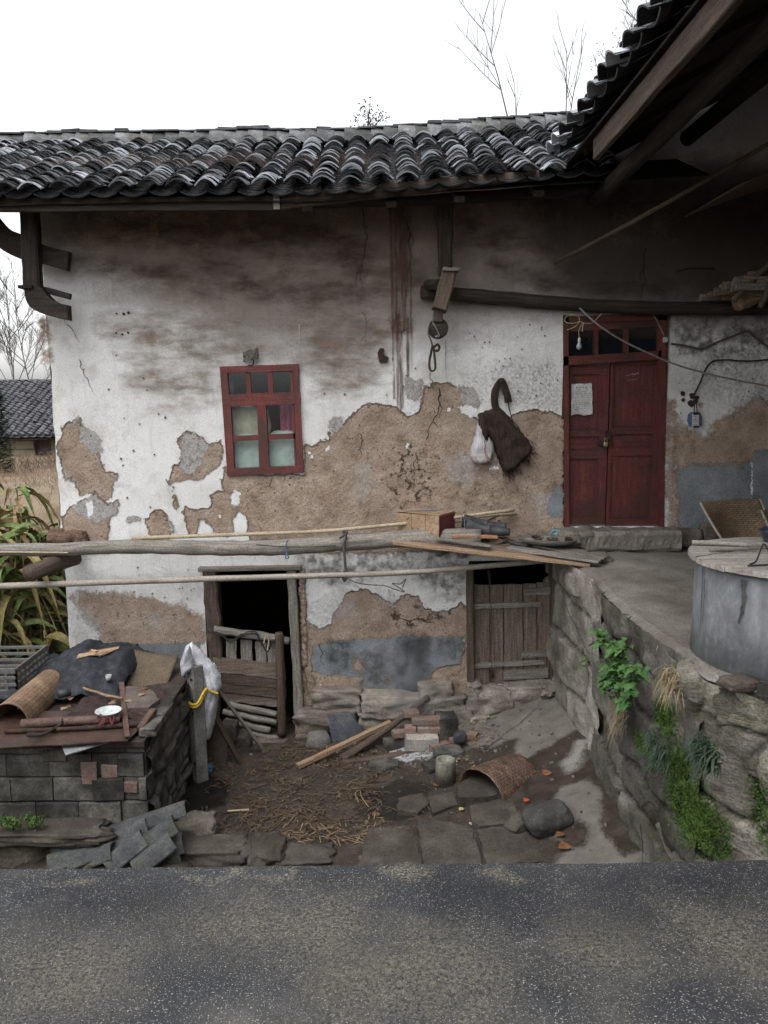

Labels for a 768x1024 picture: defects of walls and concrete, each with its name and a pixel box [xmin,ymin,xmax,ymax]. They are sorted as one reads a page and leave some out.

corrosion [389,206,412,411]
peeling [56,365,564,541]
crack [394,388,443,506]
peeling [665,379,768,527]
peeling [319,547,451,555]
peeling [69,587,207,645]
peeling [299,580,467,705]